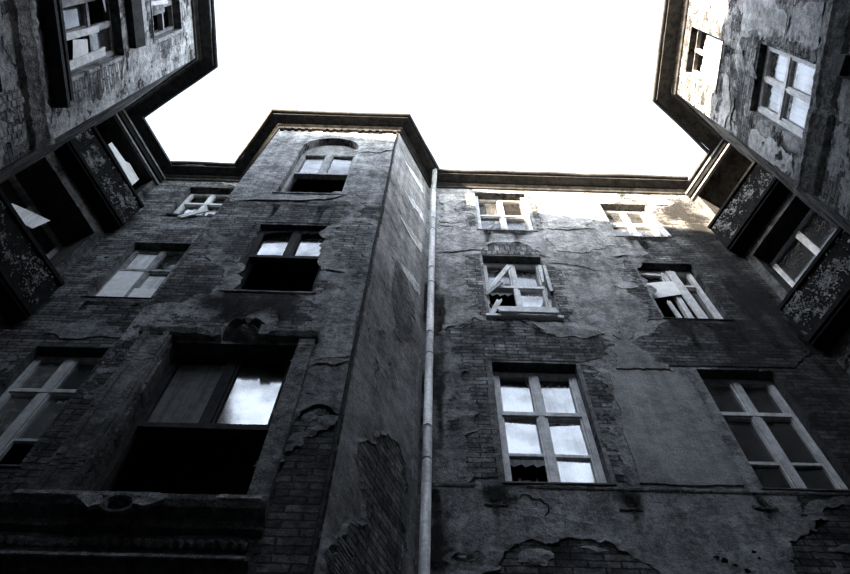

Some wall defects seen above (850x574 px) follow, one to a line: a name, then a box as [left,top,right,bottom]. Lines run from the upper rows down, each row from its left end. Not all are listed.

flaking render [689,0,827,79]
flaking render [682,70,717,114]
flaking render [141,200,380,313]
crack [609,250,629,258]
peeling [783,230,850,335]
flaking render [434,240,806,487]
flaking render [255,414,409,574]
crack [505,480,563,523]
flaking render [442,528,679,574]
flaking render [698,492,850,574]